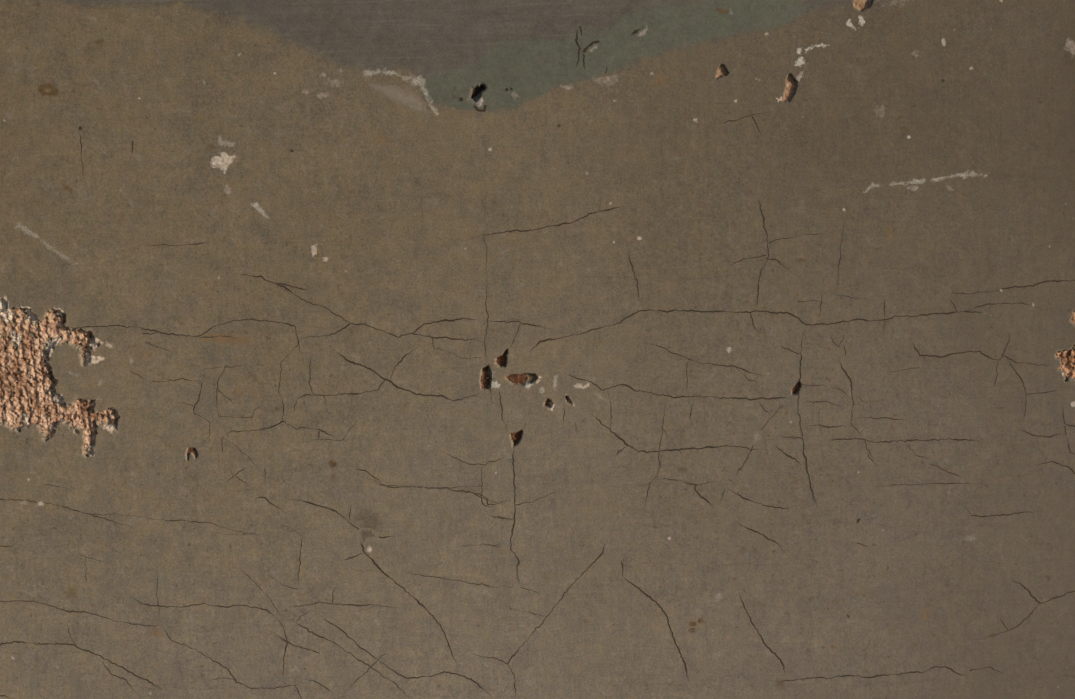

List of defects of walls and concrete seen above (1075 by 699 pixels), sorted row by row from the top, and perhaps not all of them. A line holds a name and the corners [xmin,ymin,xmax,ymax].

peeling [844,0,872,32]
peeling [774,39,831,104]
spalling [0,294,120,460]
peeling [481,350,507,391]
spalling [1055,345,1075,378]
peeling [545,393,576,412]
peeling [510,430,522,445]
crack [0,197,1075,699]